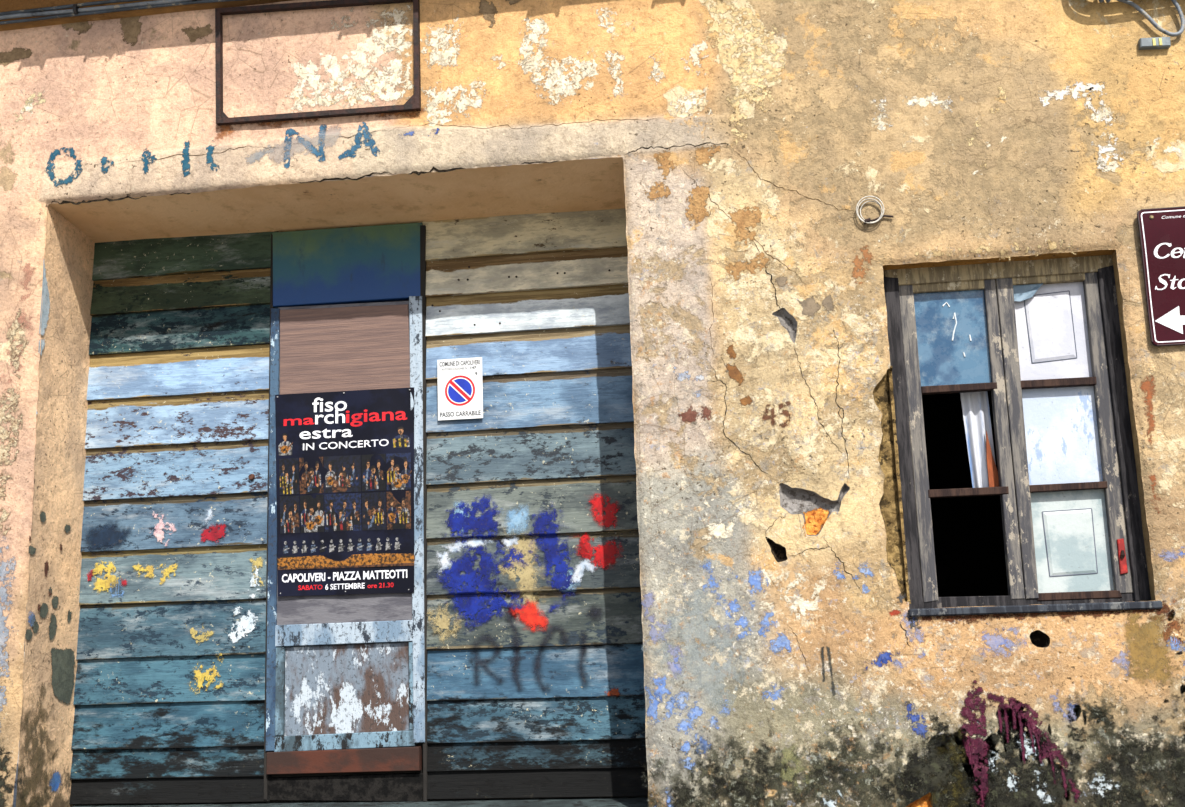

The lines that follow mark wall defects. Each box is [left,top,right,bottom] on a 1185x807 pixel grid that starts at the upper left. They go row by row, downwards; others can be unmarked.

peeling [285,4,488,127]
peeling [491,17,628,105]
peeling [669,0,785,145]
peeling [1038,81,1124,169]
peeling [725,206,787,286]
crack [708,274,776,480]
crack [794,329,849,481]
peeling [0,260,75,712]
flaking render [779,483,850,537]
crack [792,535,862,593]
leakage [0,683,57,807]
leakage [644,692,1185,807]